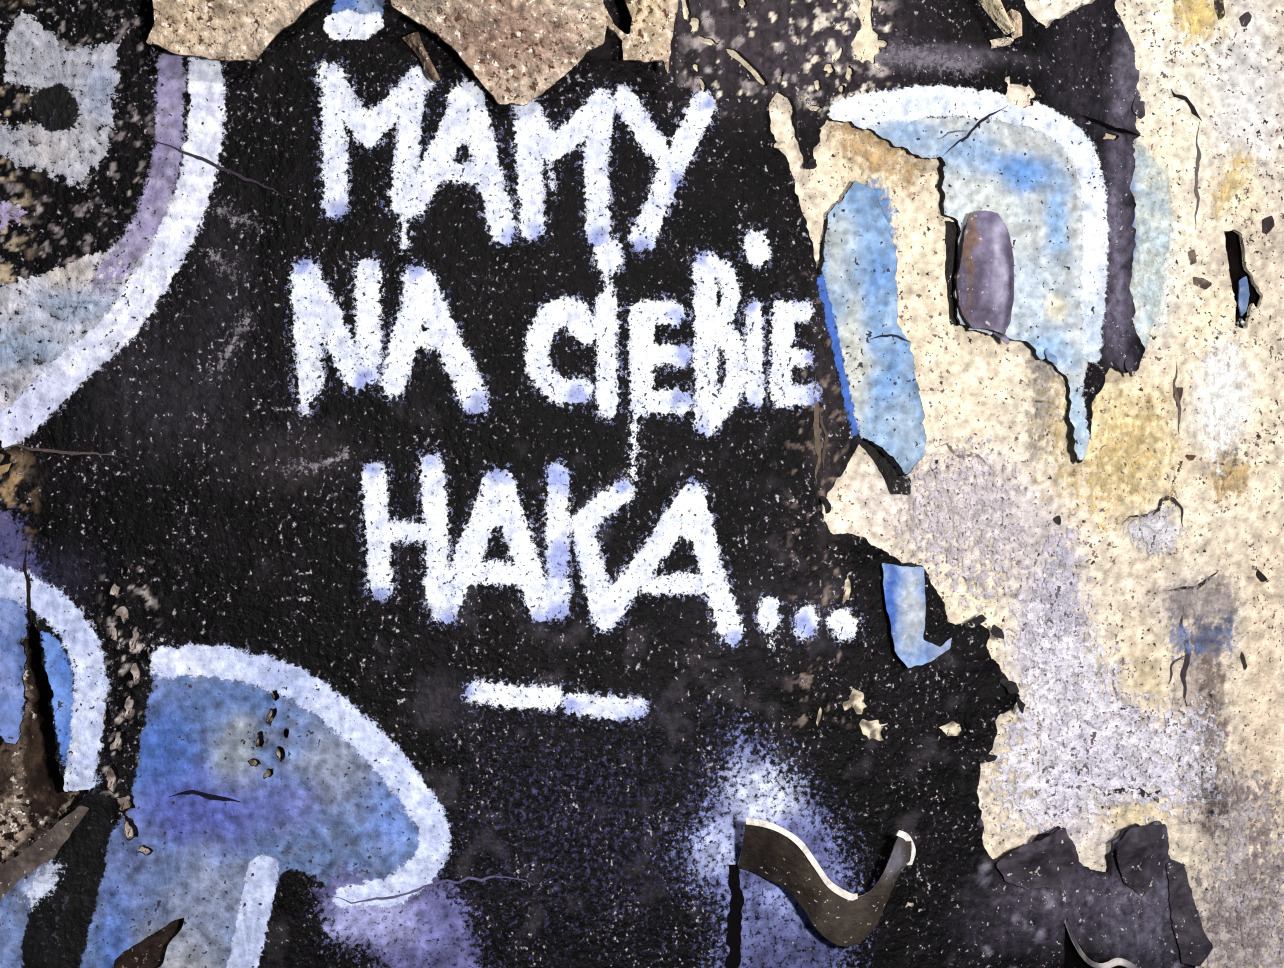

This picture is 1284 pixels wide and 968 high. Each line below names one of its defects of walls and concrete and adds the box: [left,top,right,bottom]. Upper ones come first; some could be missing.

peeling [146,0,319,62]
peeling [390,0,678,106]
peeling [0,441,12,481]
peeling [769,0,1284,968]
peeling [0,624,89,900]
peeling [737,817,916,947]